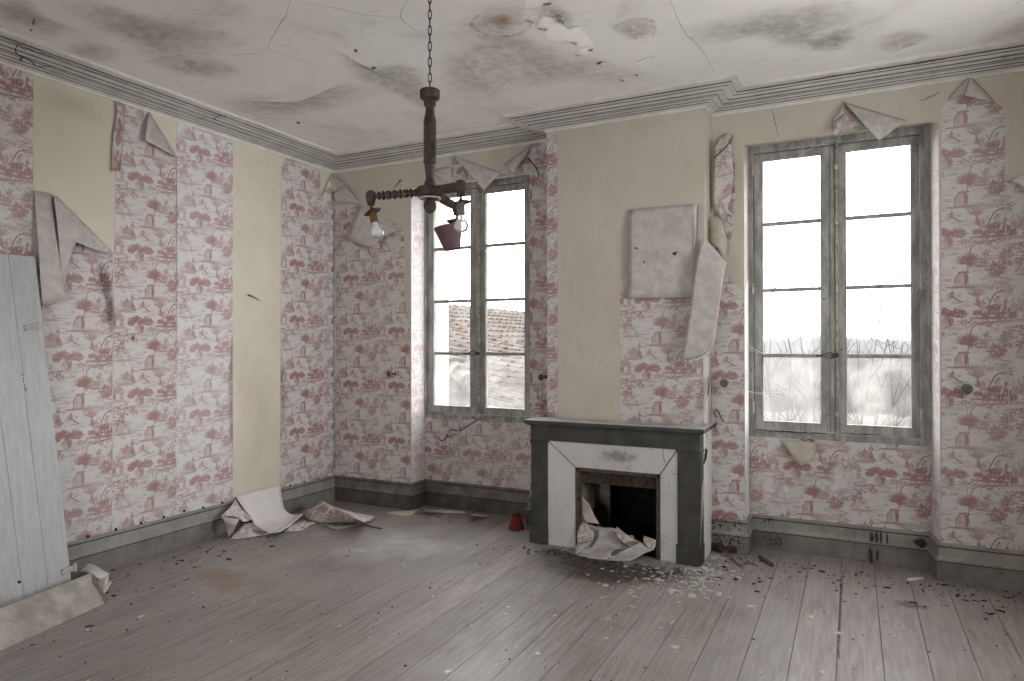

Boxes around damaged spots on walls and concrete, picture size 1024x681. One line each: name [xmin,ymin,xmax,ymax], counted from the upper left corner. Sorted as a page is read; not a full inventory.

crack [0,1,423,87]
peeling [522,0,595,57]
leakage [100,273,113,317]